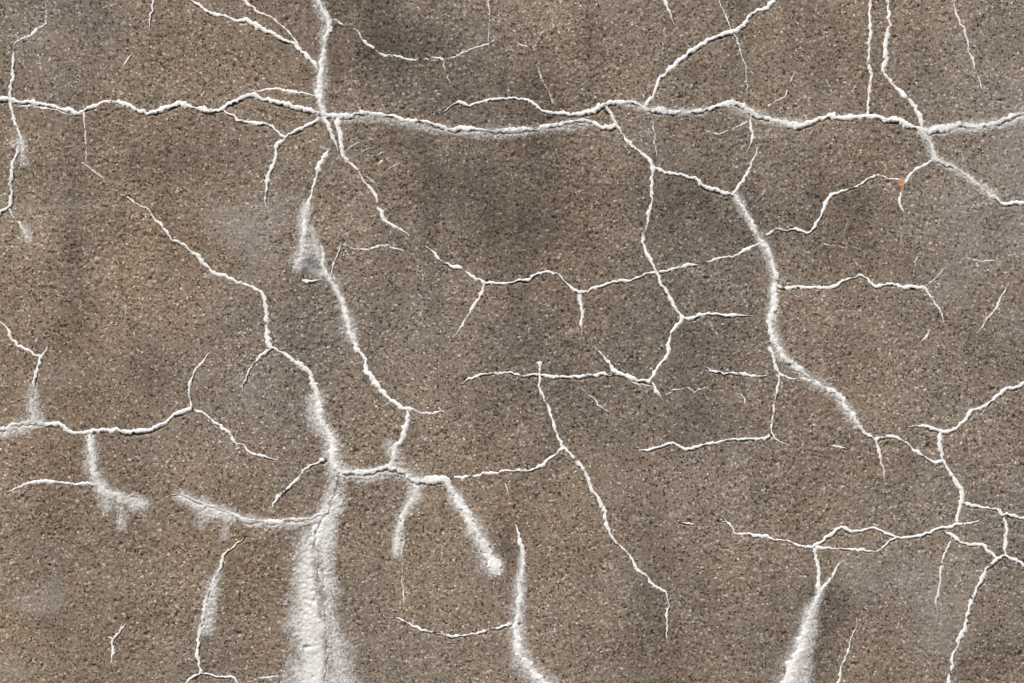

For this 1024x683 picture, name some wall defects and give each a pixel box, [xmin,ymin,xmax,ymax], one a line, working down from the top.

crack [0,0,1024,215]
damp [291,202,357,343]
efflorescence [84,435,149,530]
crack [0,323,277,503]
crack [185,538,283,683]
damp [176,390,422,683]
crack [127,196,502,576]
crack [386,524,550,683]
efflorescence [444,481,503,576]
damp [511,553,553,683]
crack [425,124,1024,683]
efflorescence [782,589,823,683]